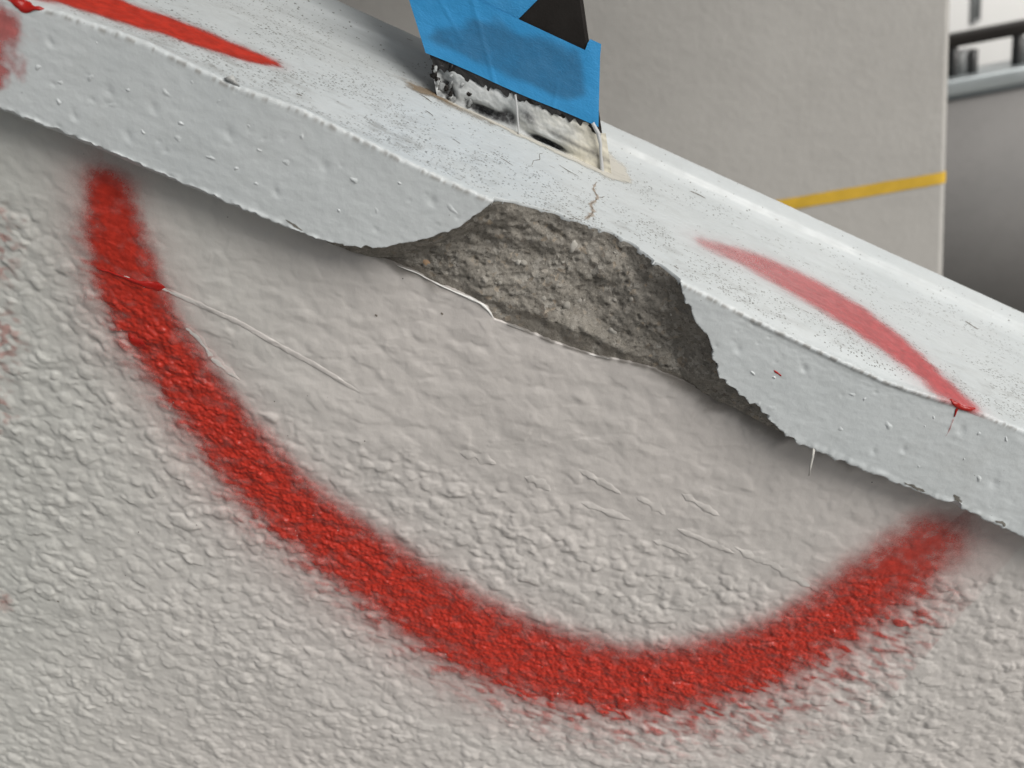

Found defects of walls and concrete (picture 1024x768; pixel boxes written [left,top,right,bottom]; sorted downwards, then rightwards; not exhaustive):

spalling [327,201,794,439]
crack [572,183,605,220]